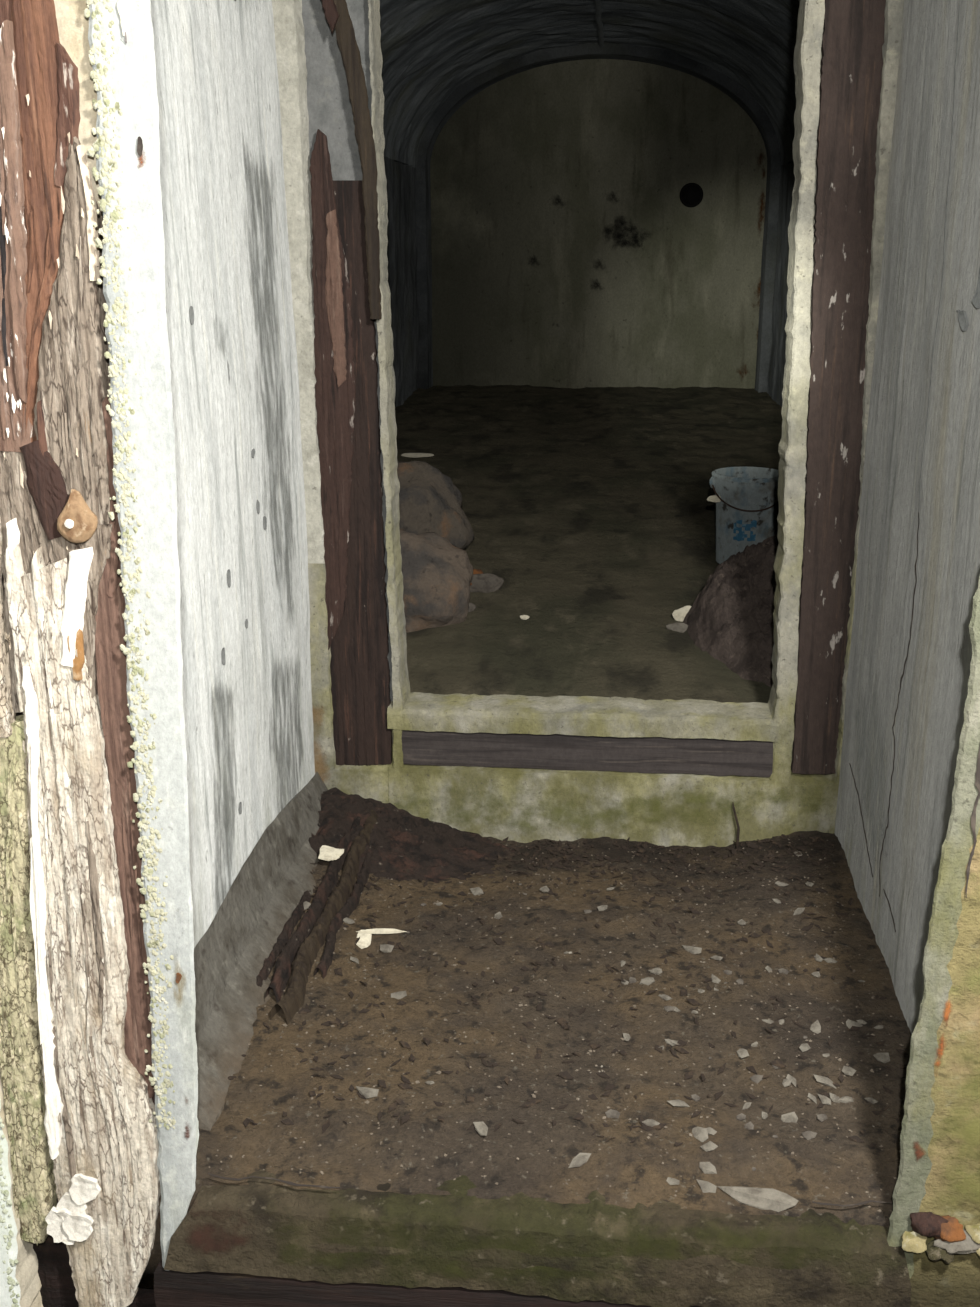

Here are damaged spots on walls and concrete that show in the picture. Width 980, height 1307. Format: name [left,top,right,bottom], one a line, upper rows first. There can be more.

peeling [3,357,22,413]
crack [965,748,980,898]
peeling [0,1118,31,1307]
flaking render [29,1173,101,1245]